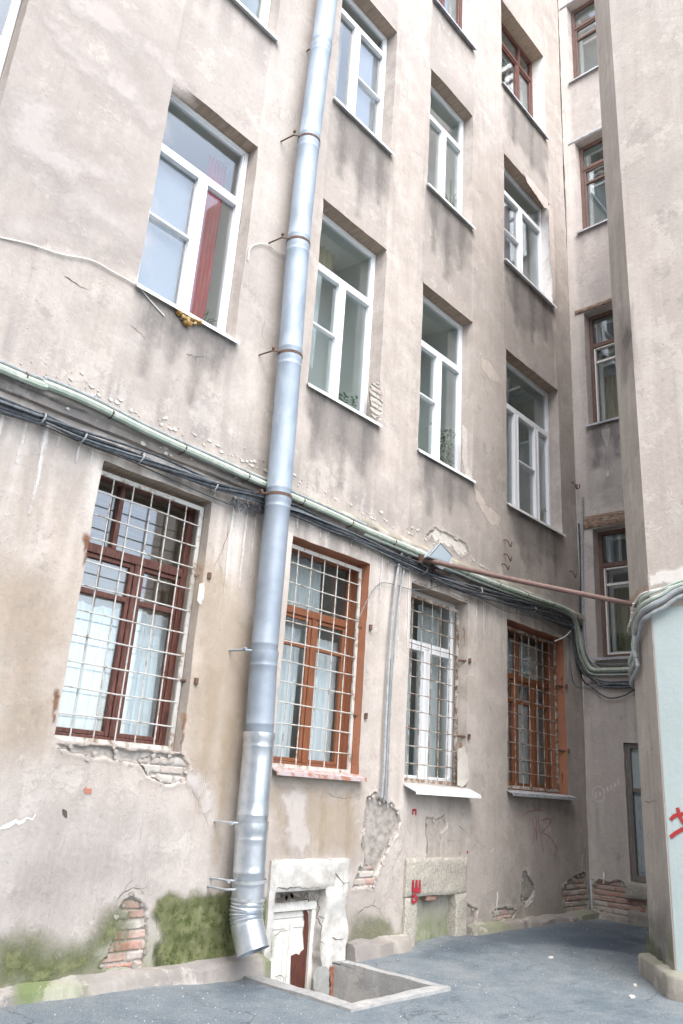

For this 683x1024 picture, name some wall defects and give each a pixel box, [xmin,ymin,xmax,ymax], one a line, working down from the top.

flaking render [293,473,489,583]
flaking render [58,743,193,786]
flaking render [352,793,401,891]
flaking render [98,891,149,969]
mould [154,944,163,967]
crack [275,873,345,948]
flaking render [492,869,536,921]
flaking render [562,873,647,916]